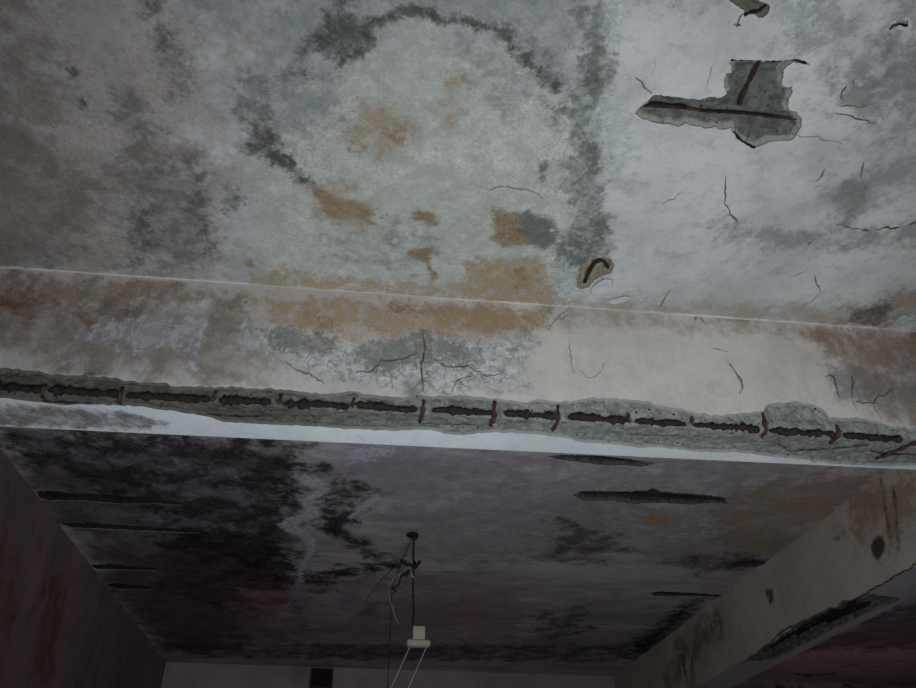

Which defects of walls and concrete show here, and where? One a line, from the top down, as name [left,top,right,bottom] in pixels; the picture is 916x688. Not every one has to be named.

damp [0,0,243,278]
damp [237,0,590,301]
spalling [492,0,810,306]
rust [314,186,375,224]
rust [413,211,436,225]
crack [724,177,738,223]
rust [0,270,241,324]
spalling [0,310,916,467]
damp [0,406,771,675]
spalling [573,488,728,505]
damp [849,478,914,560]